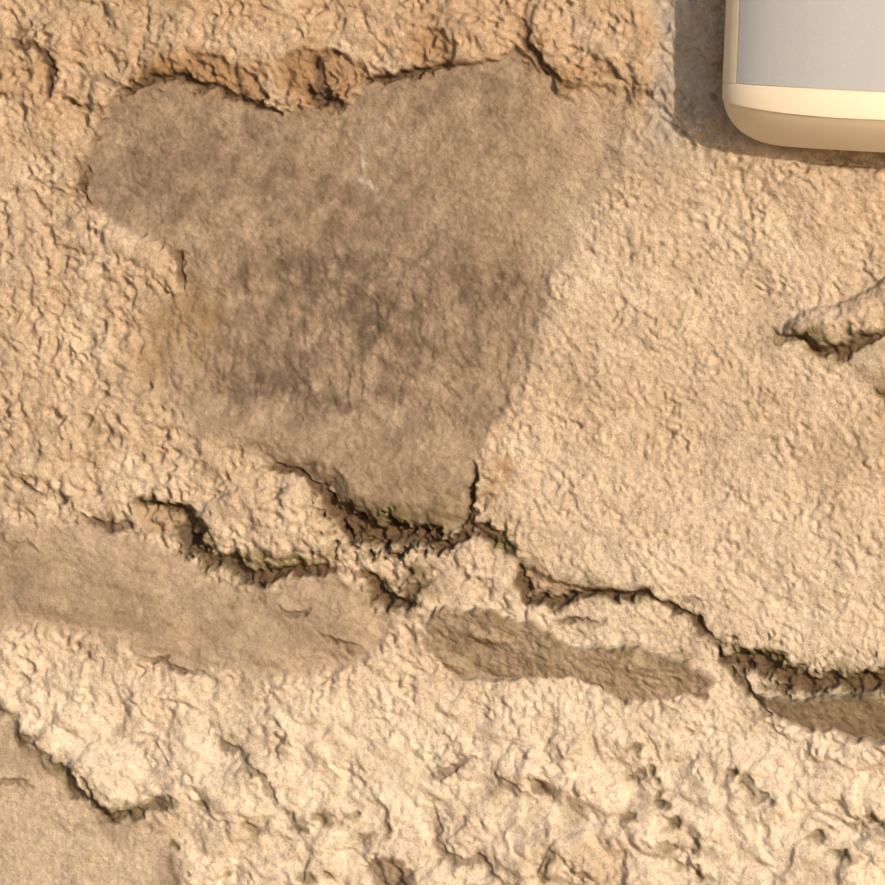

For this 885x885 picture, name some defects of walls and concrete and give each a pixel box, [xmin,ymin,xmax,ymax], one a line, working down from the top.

spalling [410,26,456,68]
spalling [141,53,269,102]
spalling [275,44,370,110]
damp [300,252,418,348]
crack [770,318,885,365]
crack [0,529,40,554]
crack [7,460,885,719]